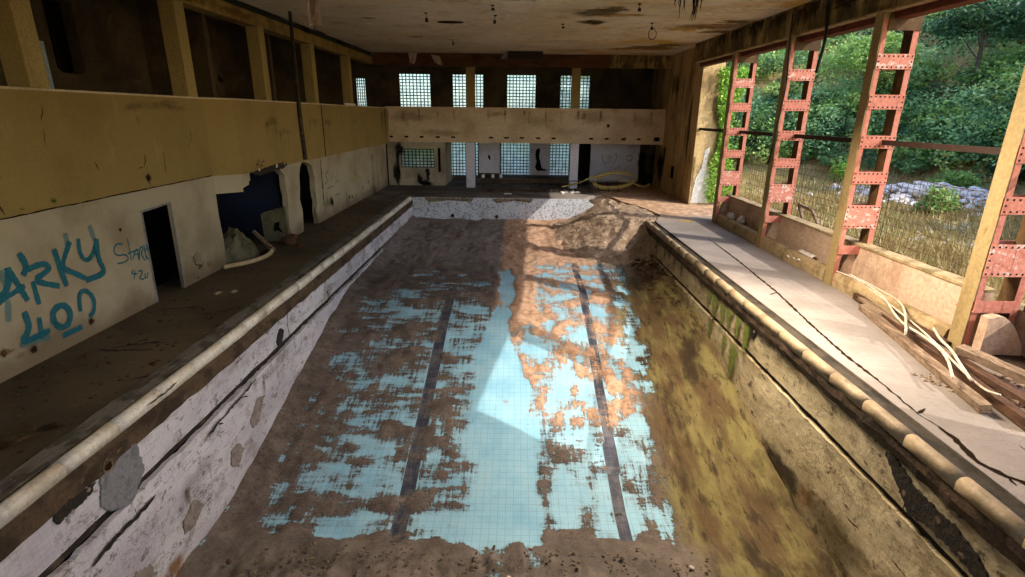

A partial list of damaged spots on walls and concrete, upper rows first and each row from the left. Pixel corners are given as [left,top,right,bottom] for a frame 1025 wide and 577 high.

water stain [576,7,643,25]
water stain [672,1,819,47]
spalling [272,328,284,348]
water stain [708,295,749,353]
crack [711,240,1025,485]
spalling [52,444,145,525]
spalling [878,452,989,577]